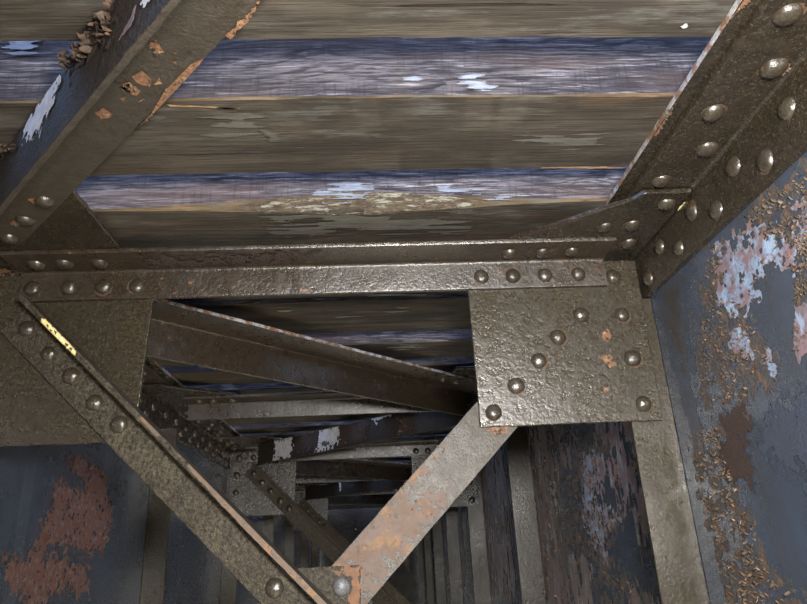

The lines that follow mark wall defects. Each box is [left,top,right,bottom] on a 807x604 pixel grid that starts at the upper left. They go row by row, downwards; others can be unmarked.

peeling [0,0,112,153]
peeling [118,0,150,41]
peeling [2,452,116,604]
rust [187,465,327,604]
peeling [272,437,295,461]
peeling [307,426,347,453]
rust [332,443,458,604]
peeling [480,448,516,603]
peeling [527,422,660,604]
peeling [687,157,807,604]